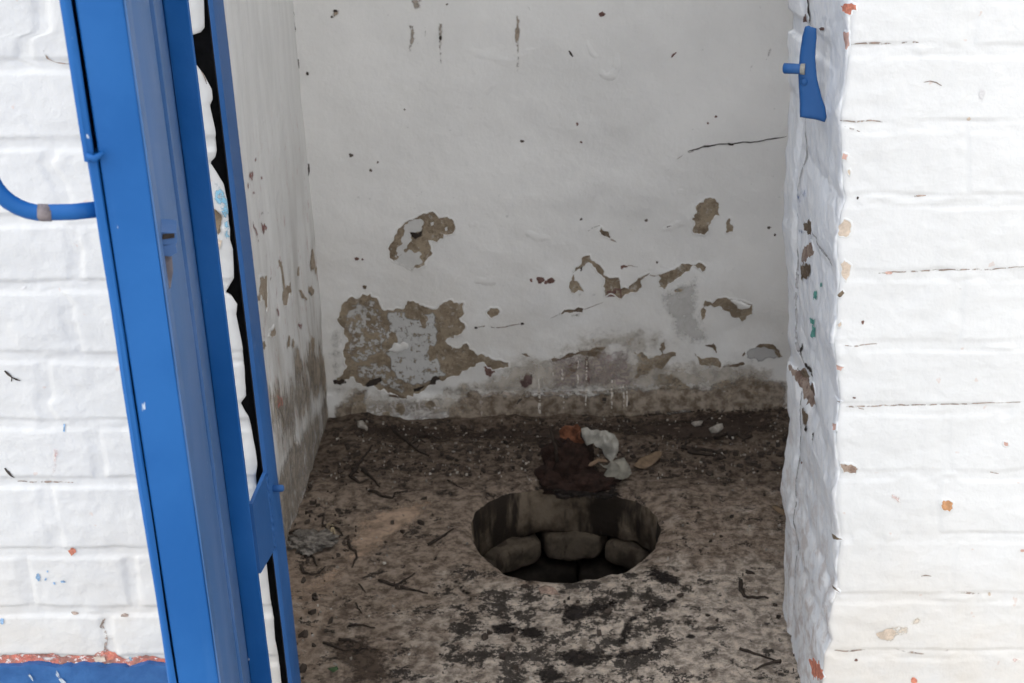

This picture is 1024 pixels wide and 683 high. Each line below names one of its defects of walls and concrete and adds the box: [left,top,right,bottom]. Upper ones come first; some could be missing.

crack [677,118,807,191]
peeling [386,210,457,272]
peeling [690,196,735,236]
leakage [276,343,327,452]
leakage [335,390,366,418]
peeling [333,285,510,400]
peeling [551,347,606,385]
peeling [530,253,707,318]
peeling [699,295,754,323]
flaking render [695,343,817,441]
crack [794,250,805,365]
crack [793,392,802,591]